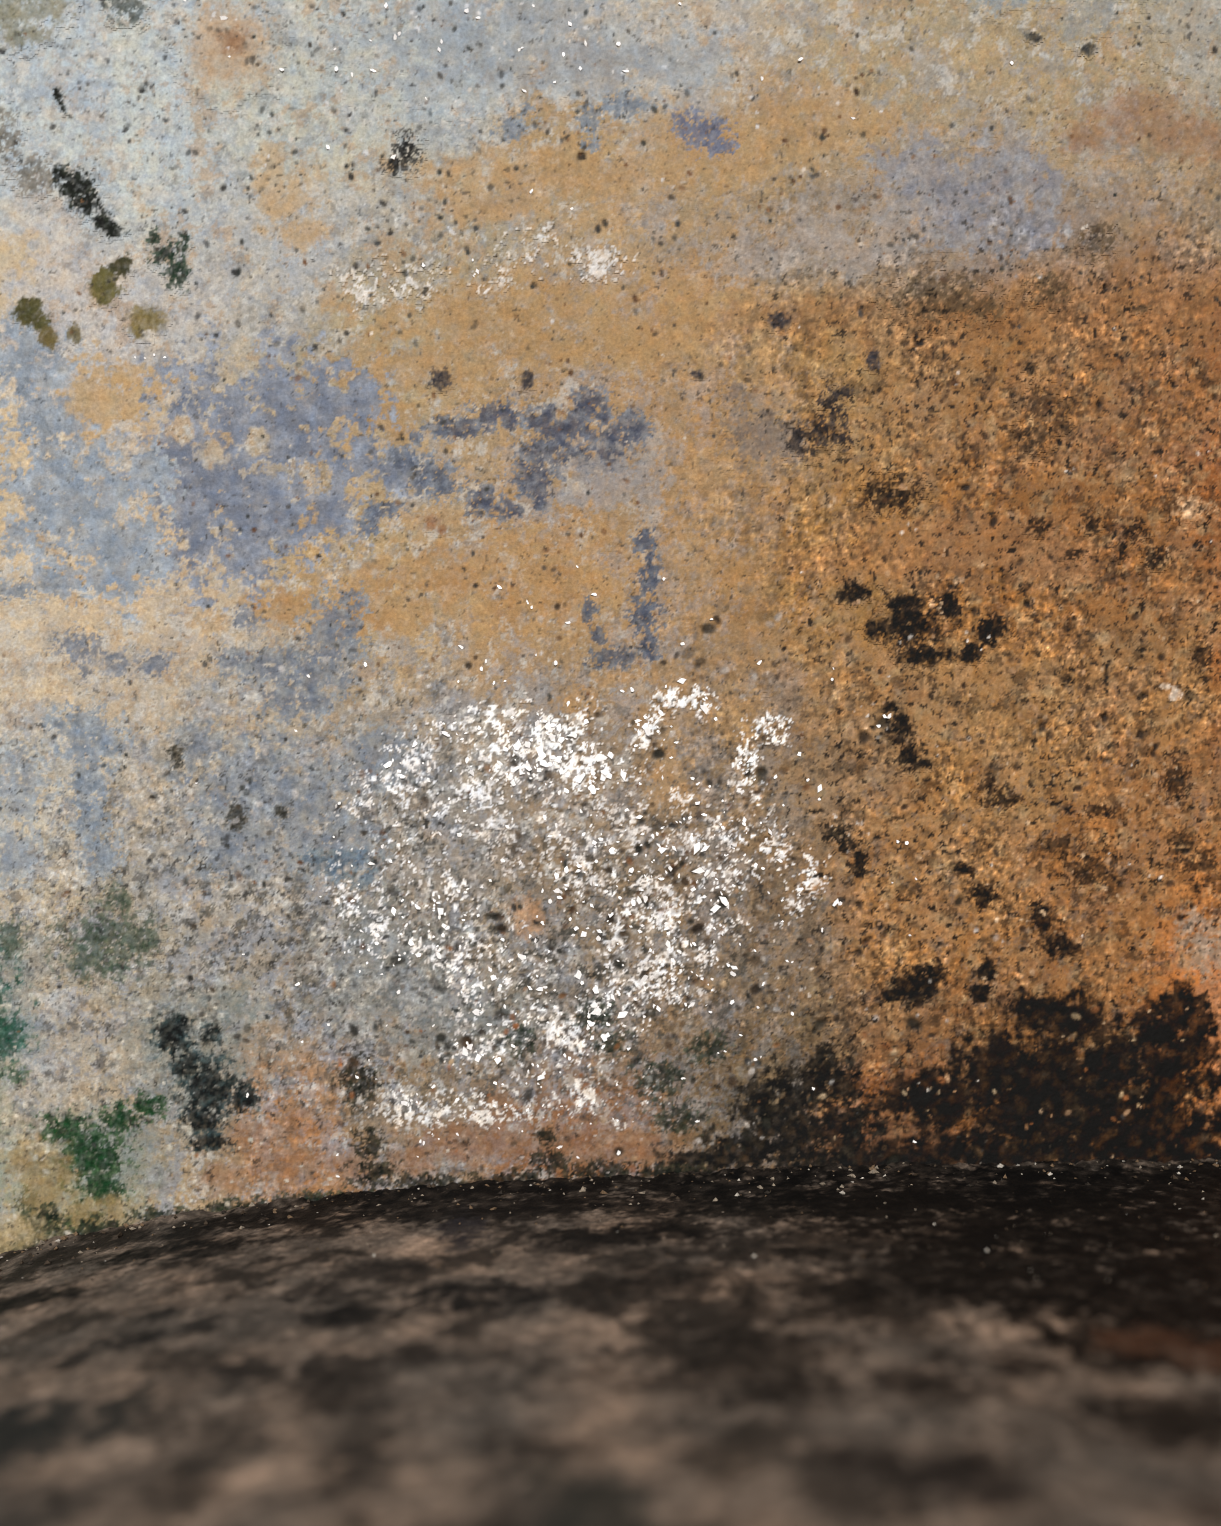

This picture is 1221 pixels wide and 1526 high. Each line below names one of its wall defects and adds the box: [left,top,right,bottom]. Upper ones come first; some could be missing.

damp [98,0,151,36]
mould [849,463,934,521]
rust [741,498,1133,598]
mould [1019,507,1175,574]
damp [832,576,1016,673]
damp [1188,630,1216,679]
damp [164,737,188,773]
damp [876,697,935,776]
damp [205,514,875,1157]
damp [970,773,1028,817]
damp [1150,749,1221,888]